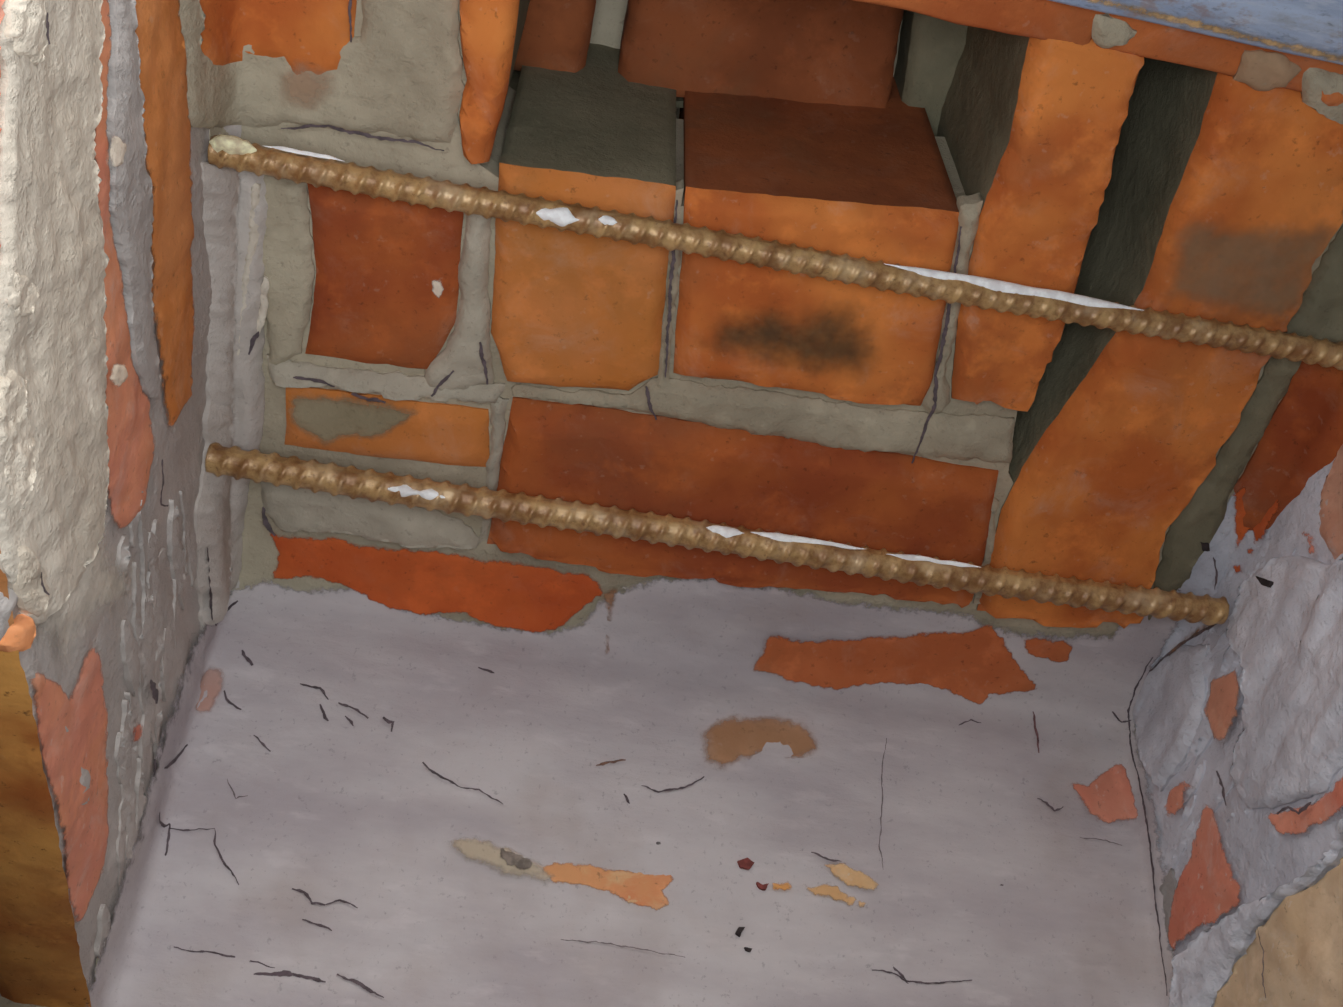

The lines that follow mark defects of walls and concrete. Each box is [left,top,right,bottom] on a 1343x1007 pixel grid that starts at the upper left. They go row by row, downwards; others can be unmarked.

flaking render [1234,488,1278,573]
spalling [0,614,36,652]
crack [300,683,394,732]
flaking render [1204,670,1239,740]
crack [596,759,704,804]
flaking render [1268,777,1343,834]
crack [159,813,239,885]
crack [292,888,358,931]
flaking render [543,863,672,910]
flaking render [1168,805,1240,949]
crack [174,947,384,998]
crack [872,967,972,984]